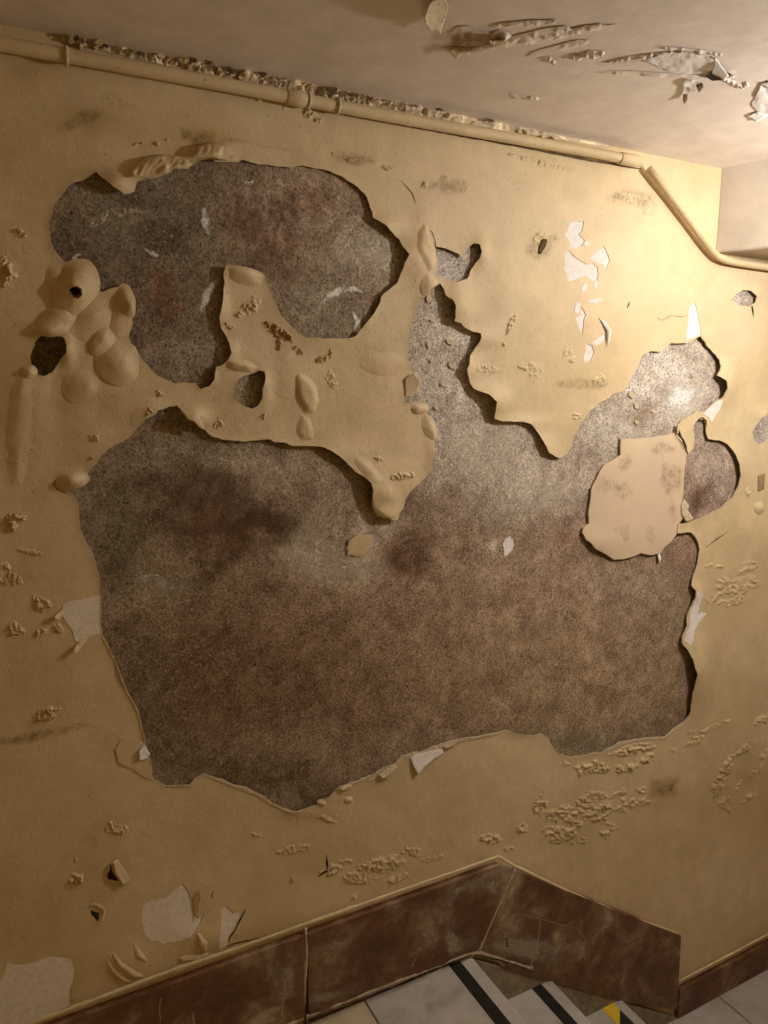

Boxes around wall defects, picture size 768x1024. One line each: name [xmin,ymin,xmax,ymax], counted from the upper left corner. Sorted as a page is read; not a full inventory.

flaking render [62,34,607,147]
peeling [424,0,768,122]
leakage [140,474,370,577]
spalling [0,135,768,823]
peeling [0,955,77,1024]
peeling [142,883,203,944]
peeling [176,905,244,971]